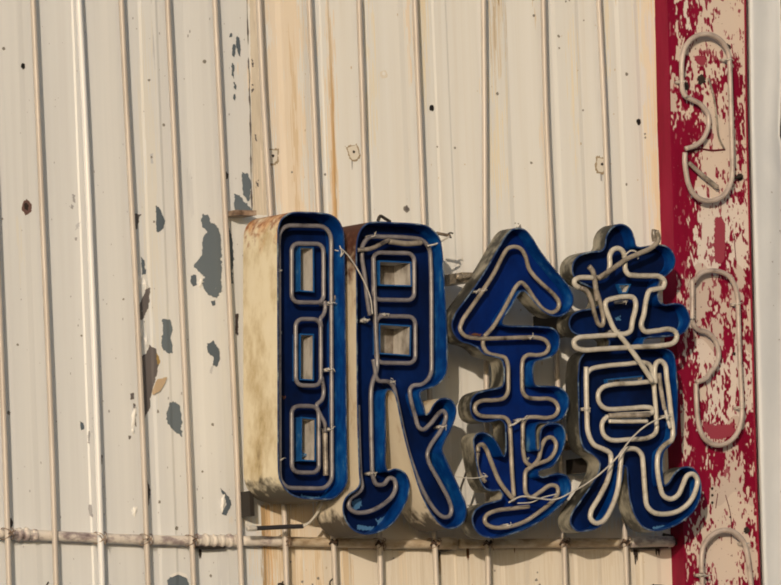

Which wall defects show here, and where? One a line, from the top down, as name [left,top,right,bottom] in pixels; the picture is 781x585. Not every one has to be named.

peeling [229,33,241,100]
corrosion [323,0,361,220]
peeling [156,206,165,232]
peeling [190,214,234,306]
peeling [669,0,758,585]
peeling [161,319,173,354]
peeling [207,340,220,374]
peeling [152,377,167,395]
peeling [157,402,183,437]
peeling [167,572,189,585]